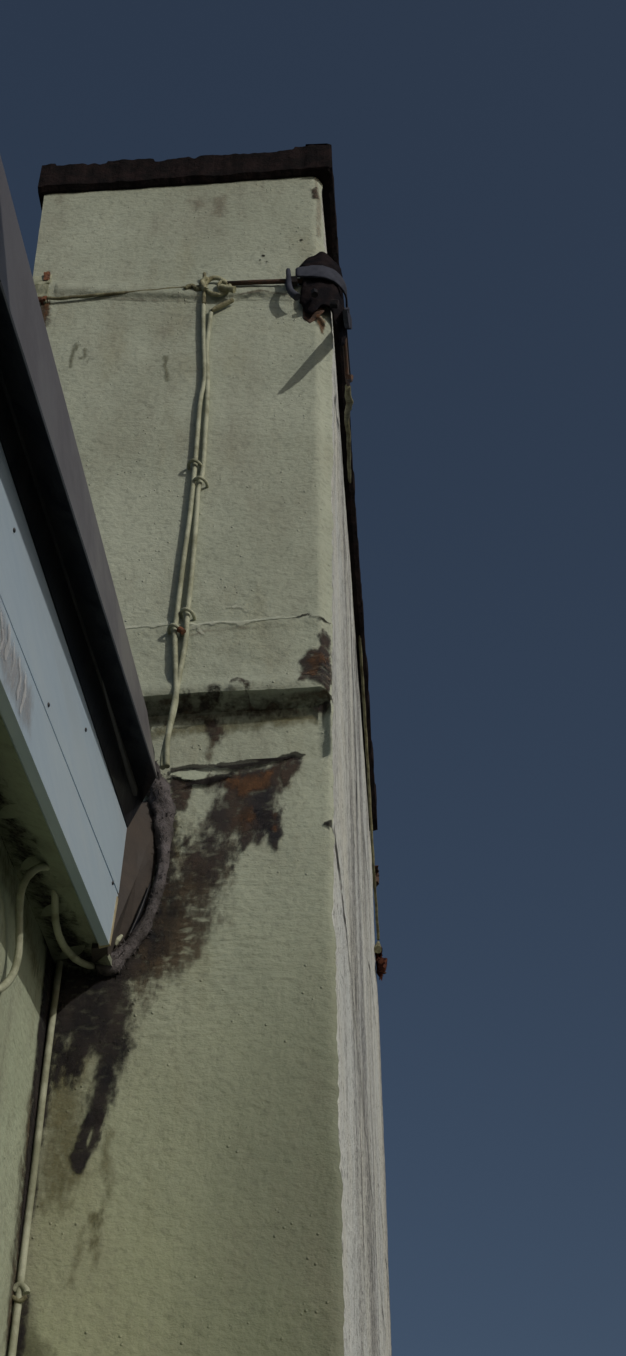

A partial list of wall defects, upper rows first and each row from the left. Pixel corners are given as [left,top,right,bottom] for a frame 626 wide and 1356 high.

water stain [145,690,330,723]
water stain [0,792,189,1356]